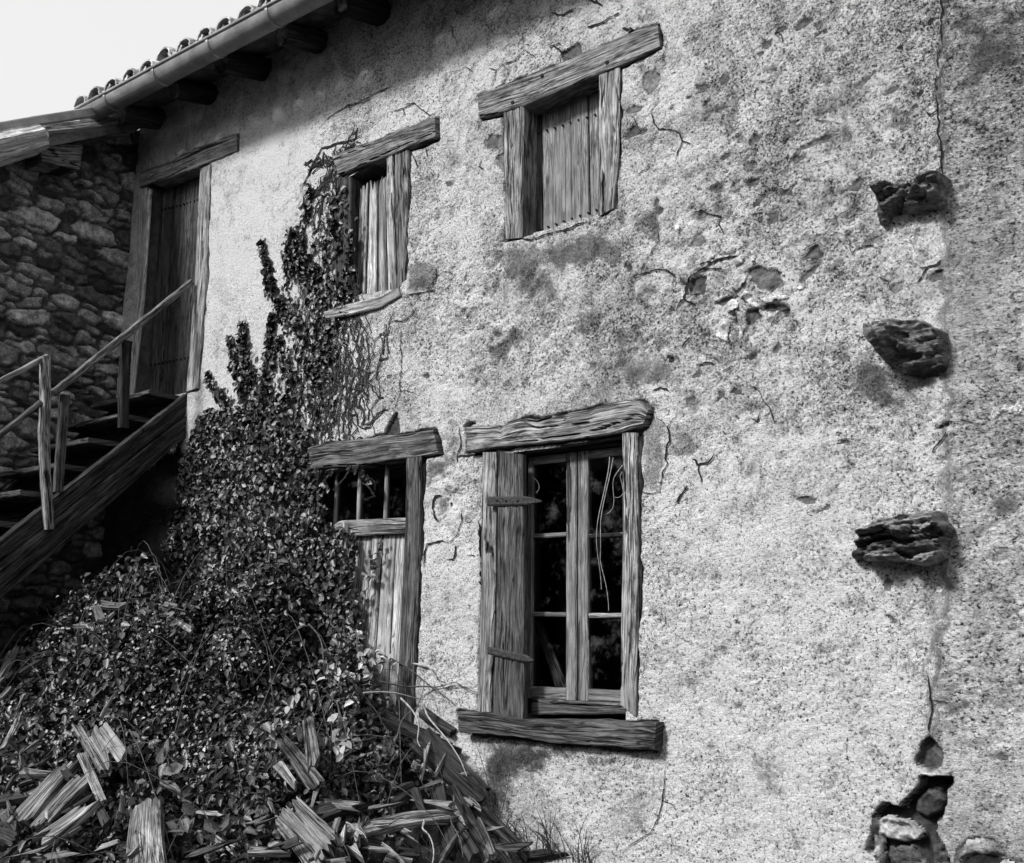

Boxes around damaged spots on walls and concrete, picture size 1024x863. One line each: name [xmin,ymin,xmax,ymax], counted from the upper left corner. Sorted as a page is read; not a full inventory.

crack [618,68,691,173]
crack [926,0,944,174]
peeling [666,224,705,246]
peeling [670,275,707,296]
peeling [716,246,823,342]
crack [642,387,714,503]
crack [927,673,948,731]
spalling [870,737,1024,863]